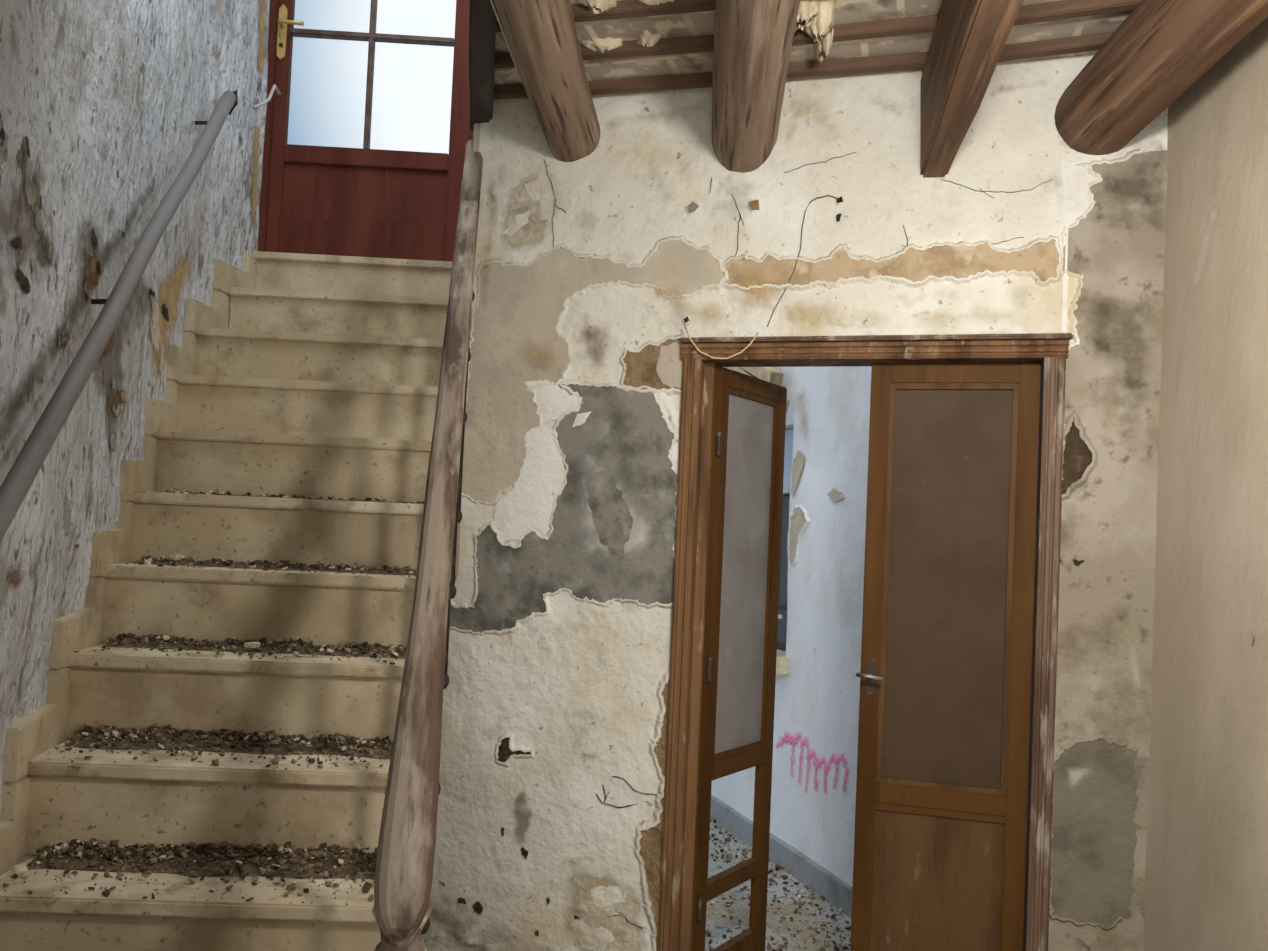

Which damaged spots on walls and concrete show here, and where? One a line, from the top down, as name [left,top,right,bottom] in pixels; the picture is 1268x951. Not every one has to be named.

peeling [580,0,617,16]
peeling [581,30,662,53]
peeling [794,0,836,62]
crack [784,152,856,173]
flaking render [0,114,55,266]
crack [941,179,1051,198]
water stain [1114,170,1152,203]
flaking render [17,268,30,294]
flaking render [149,289,169,375]
water stain [1096,300,1145,386]
flaking render [450,148,1168,951]